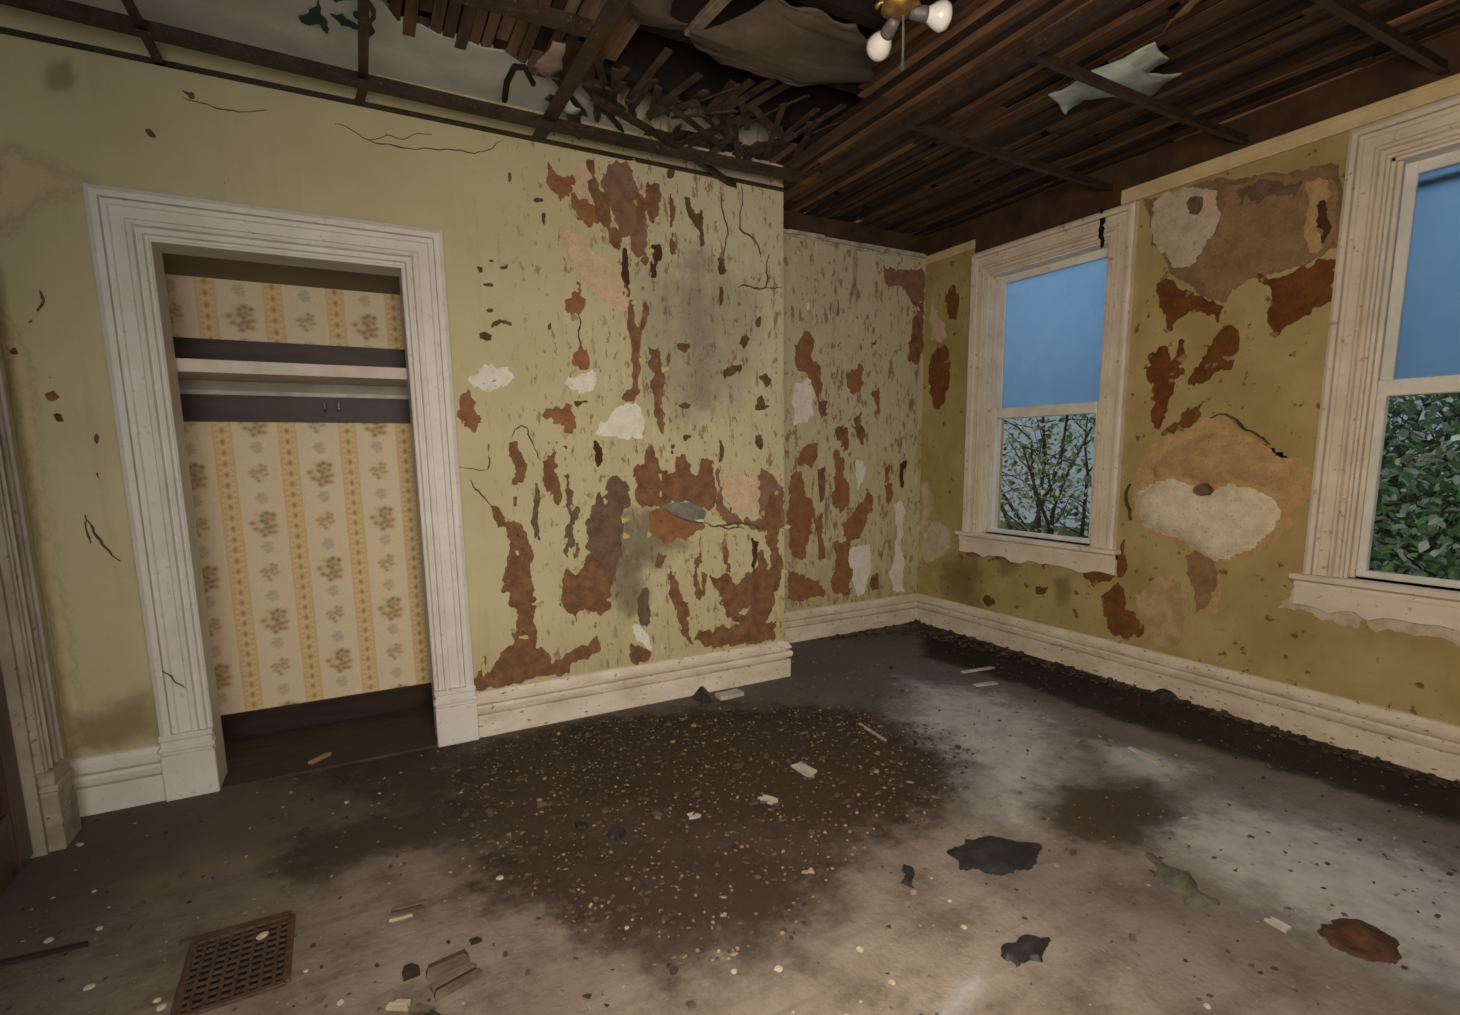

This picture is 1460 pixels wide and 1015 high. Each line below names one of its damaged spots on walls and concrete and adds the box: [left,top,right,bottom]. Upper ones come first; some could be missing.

crack [182,90,267,113]
crack [335,123,502,154]
spalling [1144,162,1343,436]
spalling [457,364,514,469]
peeling [474,158,1014,691]
peeling [1083,539,1218,647]